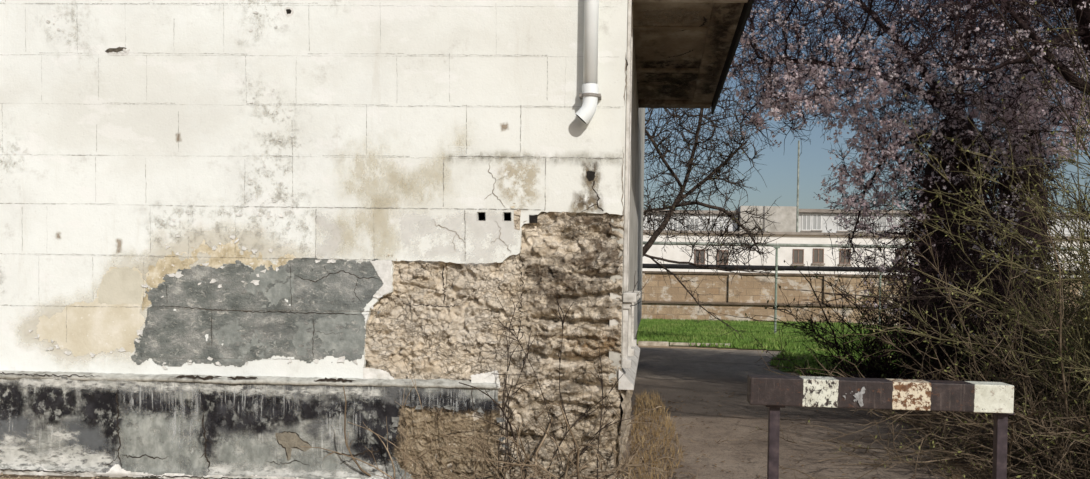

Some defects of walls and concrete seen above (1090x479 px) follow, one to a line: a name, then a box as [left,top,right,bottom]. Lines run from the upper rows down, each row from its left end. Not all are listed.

leakage [640,3,740,98]
crack [583,153,624,223]
peeling [22,183,383,369]
crack [403,219,465,308]
crack [485,165,524,364]
leakage [0,377,381,398]
leakage [0,426,115,473]
spalling [0,464,304,479]
spalling [275,431,311,461]
leakage [207,462,398,479]
spalling [390,395,511,479]